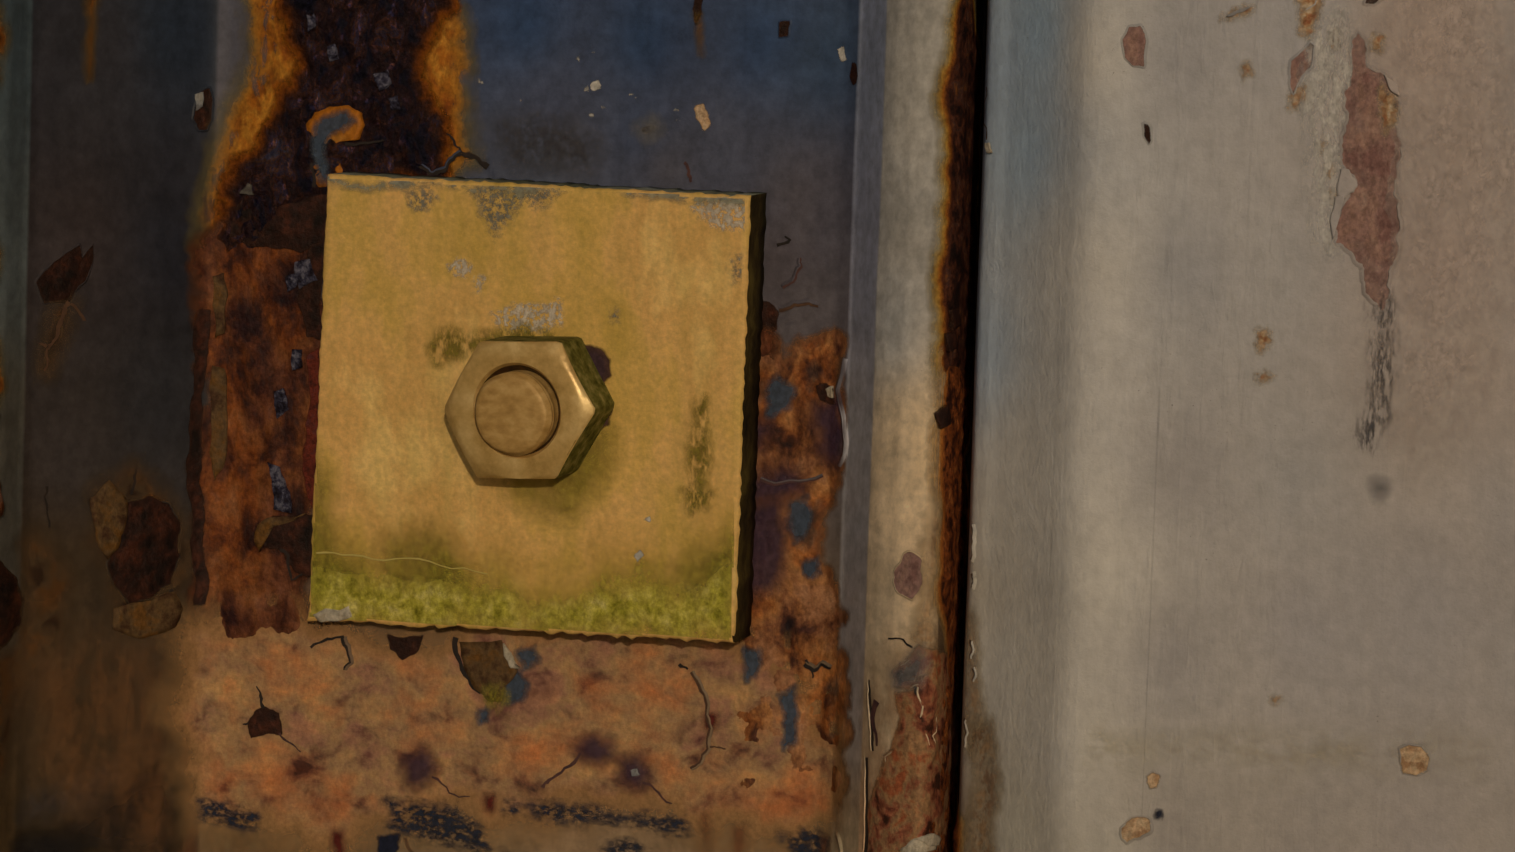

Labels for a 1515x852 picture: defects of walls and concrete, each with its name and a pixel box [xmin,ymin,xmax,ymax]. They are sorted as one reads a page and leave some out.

corrosion [0,561,24,650]
corrosion [90,0,854,852]
corrosion [867,0,999,852]
peeling [1330,28,1405,314]